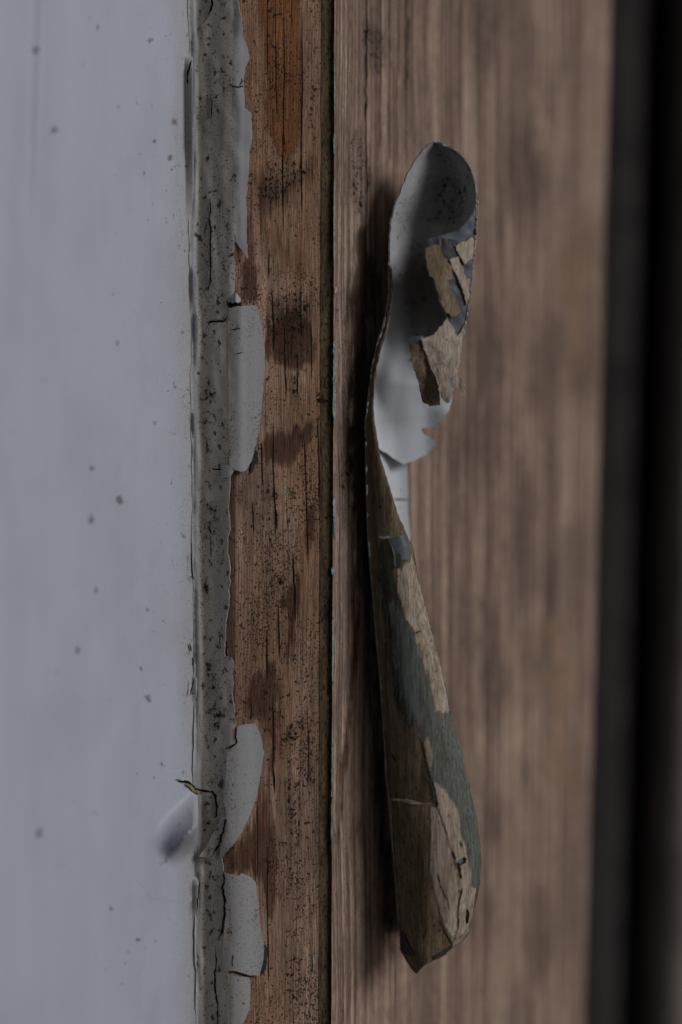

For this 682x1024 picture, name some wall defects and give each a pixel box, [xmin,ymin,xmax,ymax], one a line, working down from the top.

peeling [233,0,252,259]
peeling [221,292,265,478]
peeling [364,140,482,974]
peeling [199,723,264,859]
crack [176,412,320,1024]
peeling [222,872,268,1024]